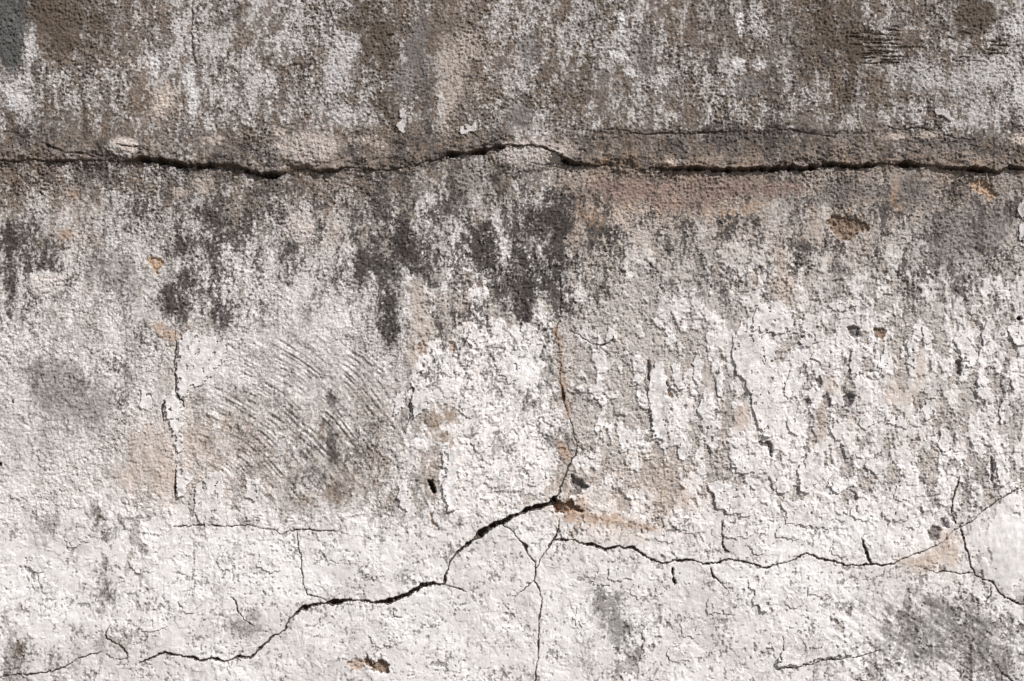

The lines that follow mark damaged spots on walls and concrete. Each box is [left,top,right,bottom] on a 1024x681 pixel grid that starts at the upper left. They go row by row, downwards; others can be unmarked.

damp [181,60,201,120]
crack [0,125,1024,179]
damp [0,215,59,319]
damp [150,176,233,329]
damp [351,215,439,356]
damp [462,189,624,323]
peeling [646,299,883,475]
peeling [953,324,1013,425]
peeling [1007,316,1024,345]
crack [0,275,1024,681]
spalling [552,474,589,514]
peeling [707,450,854,557]